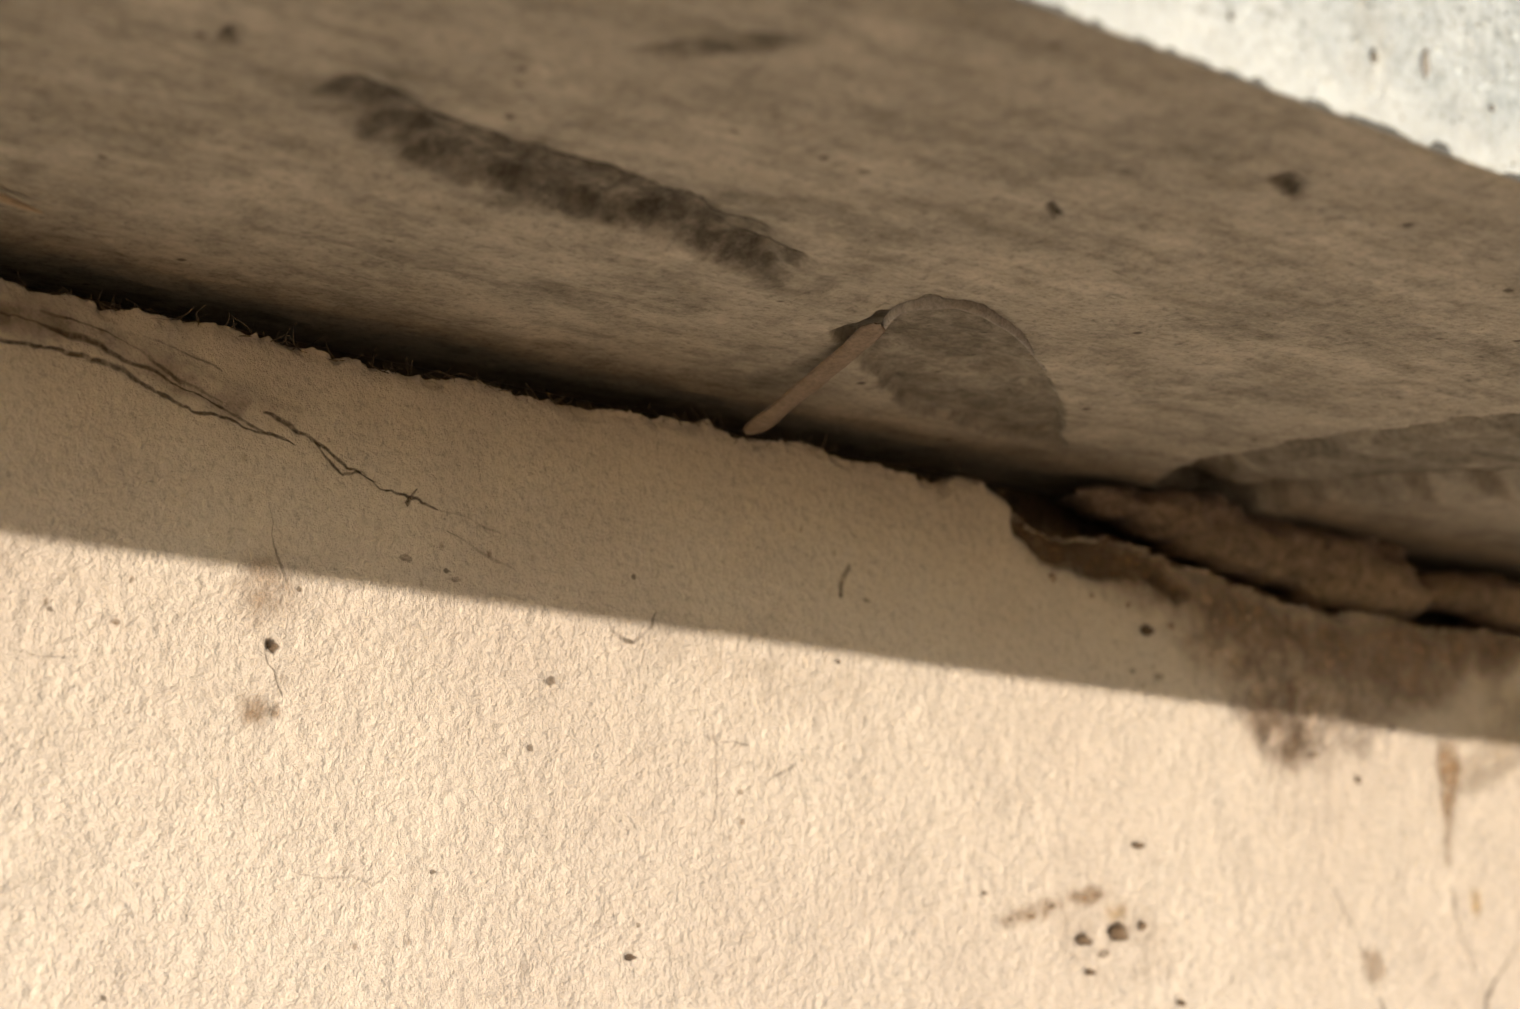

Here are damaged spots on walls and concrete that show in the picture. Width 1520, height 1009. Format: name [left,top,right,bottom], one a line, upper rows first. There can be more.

crack [0,311,438,510]
leakage [1094,557,1518,756]
leakage [1439,746,1460,817]